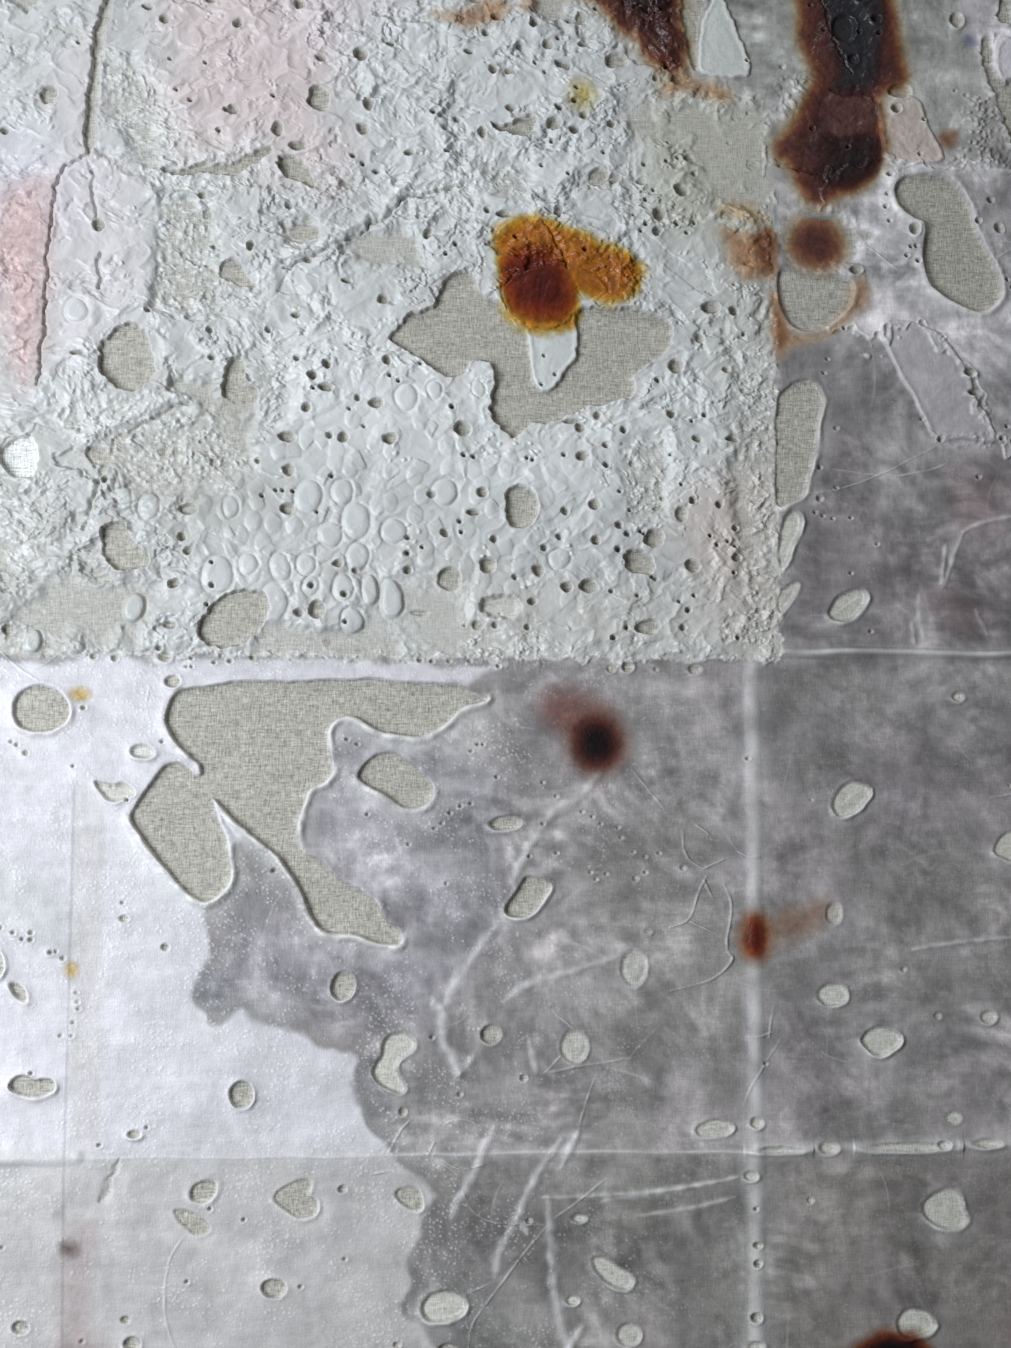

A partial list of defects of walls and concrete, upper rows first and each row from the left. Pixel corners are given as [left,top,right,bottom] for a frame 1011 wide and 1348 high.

crack [34,0,111,386]
spalling [385,265,678,443]
rust [493,213,644,335]
rust [722,205,808,352]
spalling [774,266,858,335]
rust [828,281,867,333]
spalling [883,96,1007,316]
spalling [770,375,829,617]
spalling [92,672,493,950]